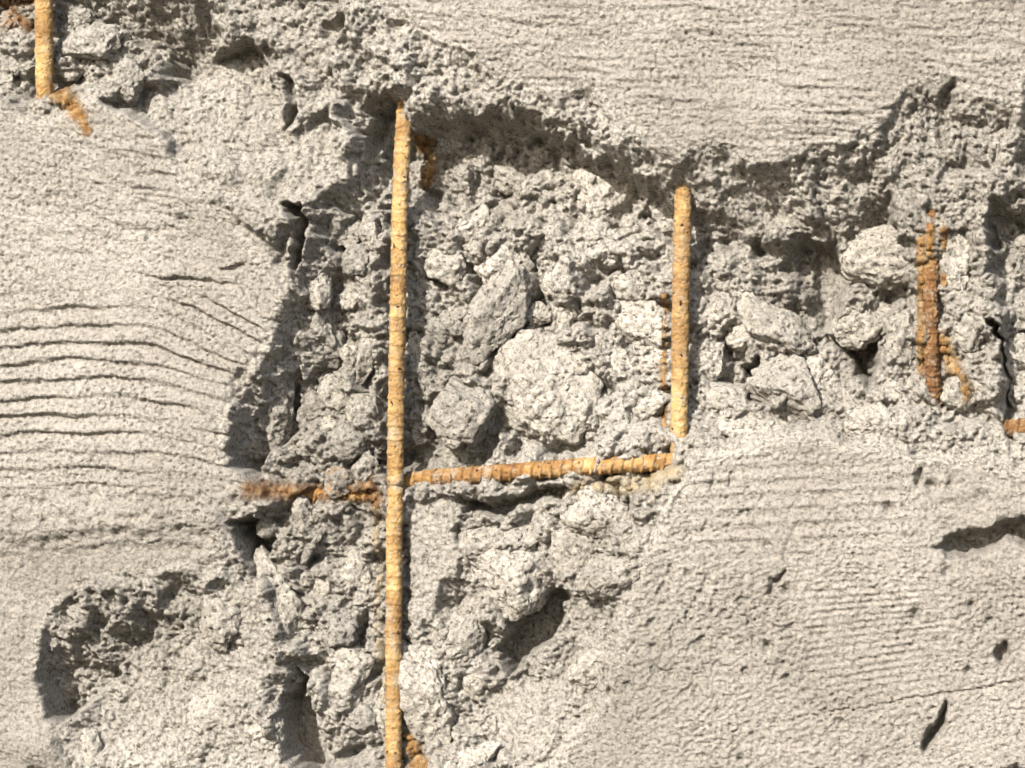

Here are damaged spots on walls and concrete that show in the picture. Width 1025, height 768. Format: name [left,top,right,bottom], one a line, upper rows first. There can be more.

rust [0,0,35,33]
spalling [0,0,254,133]
rust [412,133,439,188]
spalling [736,296,817,361]
rust [916,223,973,401]
spalling [32,536,326,768]
spalling [188,492,386,768]
rust [240,476,386,701]
spalling [384,100,412,768]
rust [569,463,685,496]
crack [756,678,1025,728]
hole [921,507,1025,565]